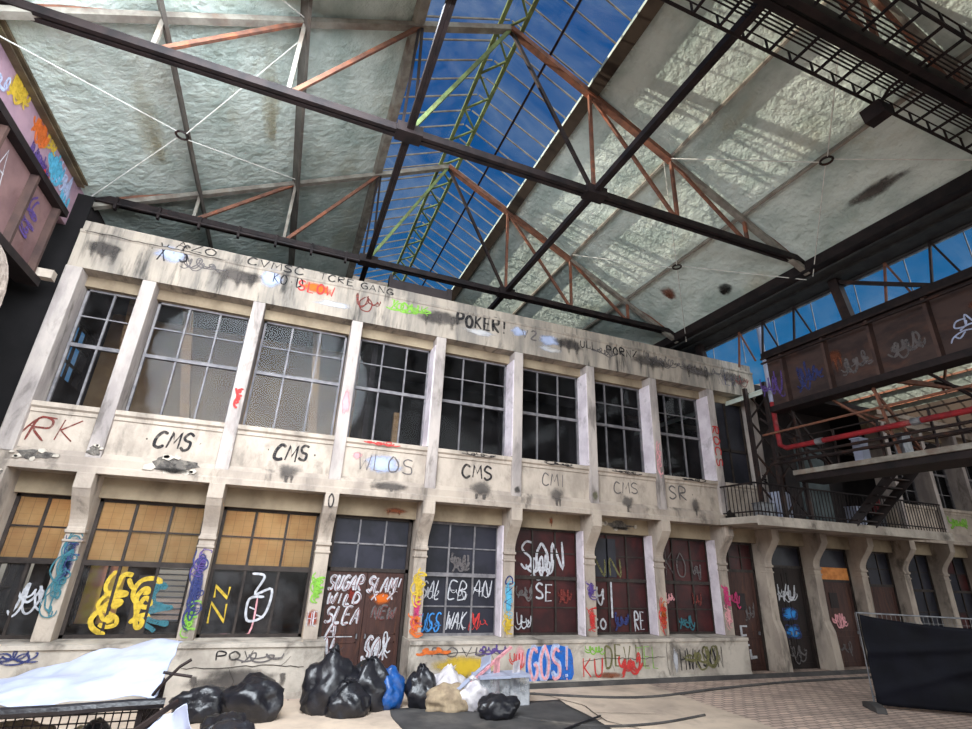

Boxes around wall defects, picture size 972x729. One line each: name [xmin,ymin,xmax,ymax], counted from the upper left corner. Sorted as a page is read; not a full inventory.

water stain [850,172,904,205]
spalling [142,455,200,475]